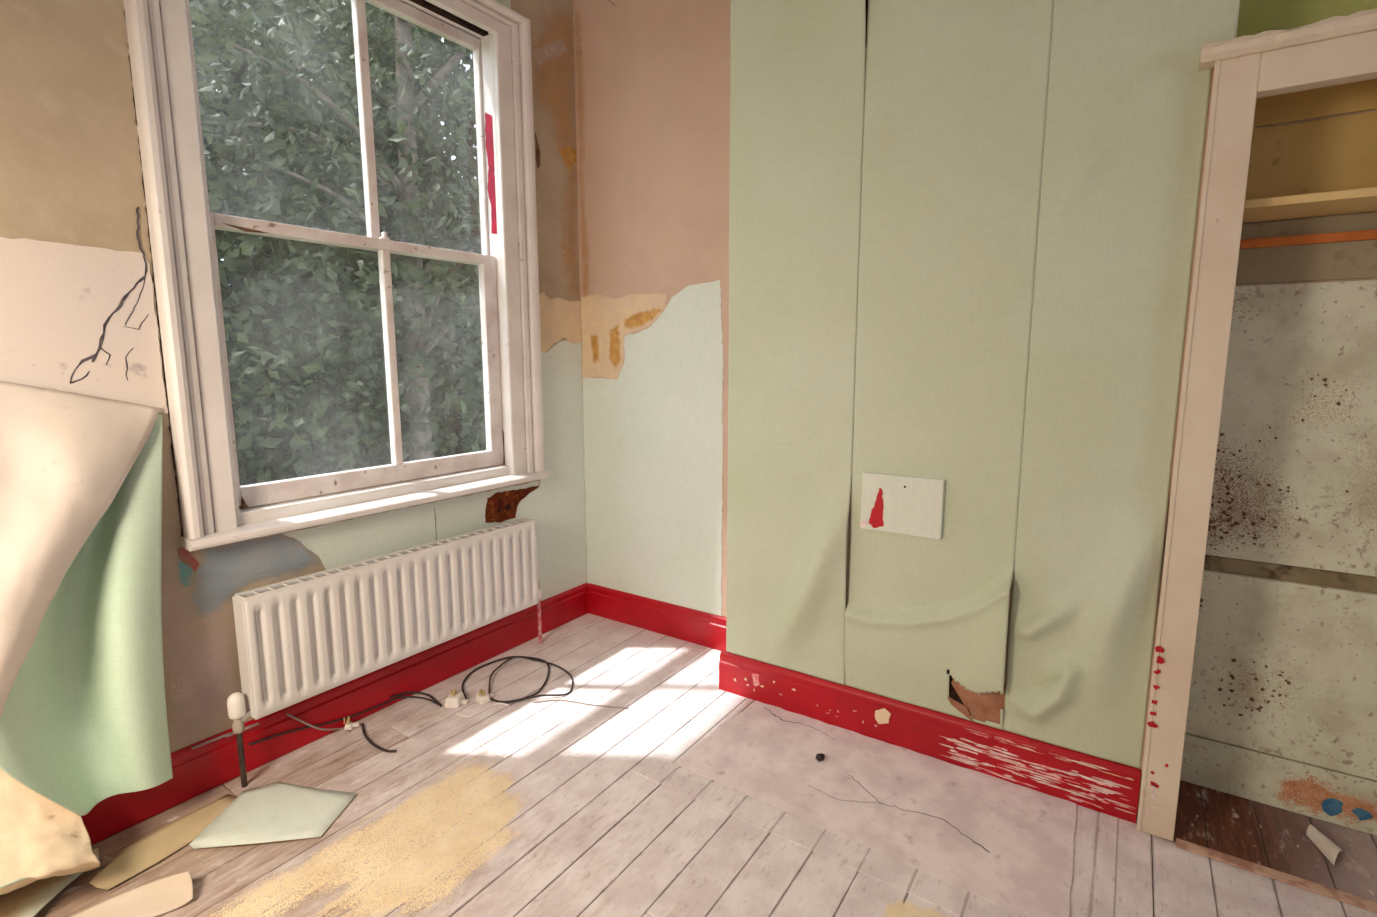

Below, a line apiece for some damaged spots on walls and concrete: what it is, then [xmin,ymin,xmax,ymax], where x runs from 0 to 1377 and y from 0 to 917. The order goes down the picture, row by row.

crack [70,10,183,537]
flaking render [485,486,539,523]
mould [1206,361,1377,558]
peeling [0,414,199,816]
peeling [939,669,1168,815]
peeling [1147,646,1165,728]
leakage [1190,572,1312,720]
peeling [1275,773,1377,824]